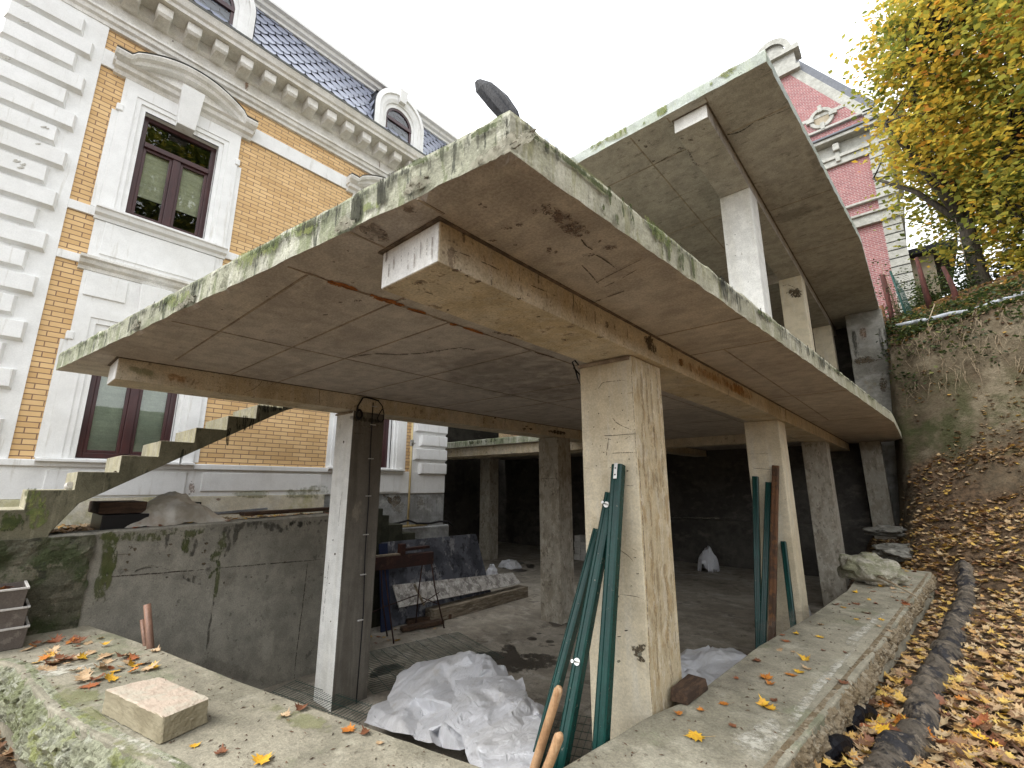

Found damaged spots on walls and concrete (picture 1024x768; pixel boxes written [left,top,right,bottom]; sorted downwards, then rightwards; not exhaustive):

damp [427,132,479,171]
damp [524,122,559,161]
damp [377,166,404,204]
damp [350,188,433,277]
damp [532,204,640,302]
corrosion [310,273,553,358]
damp [100,528,204,556]
damp [223,520,322,557]
spalling [632,644,646,662]